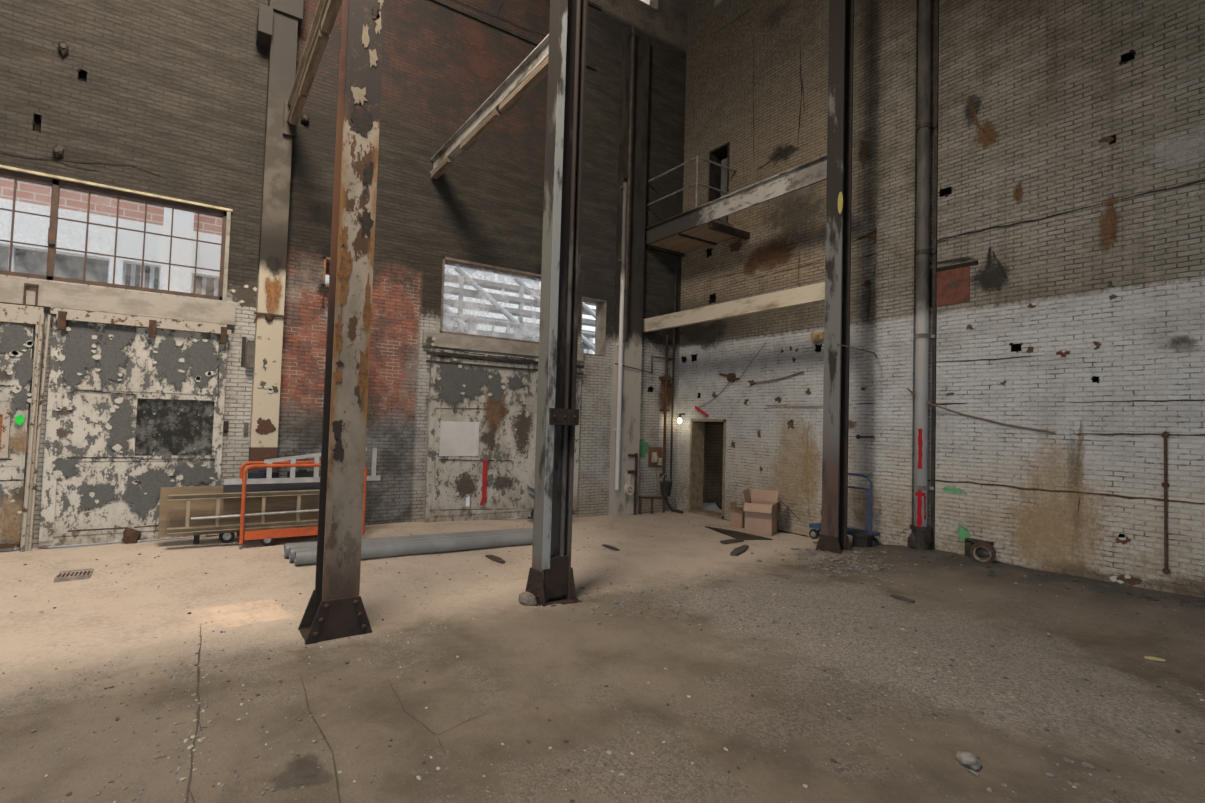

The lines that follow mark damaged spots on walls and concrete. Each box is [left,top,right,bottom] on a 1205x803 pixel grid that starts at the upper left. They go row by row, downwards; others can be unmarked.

peeling [362,0,384,68]
corrosion [965,95,997,147]
corrosion [1100,197,1119,250]
corrosion [744,239,796,275]
peeling [0,322,35,411]
peeling [53,321,137,459]
peeling [151,330,223,392]
peeling [426,336,525,413]
peeling [511,404,533,456]
peeling [79,459,223,519]
peeling [452,469,515,501]
crack [185,626,202,803]